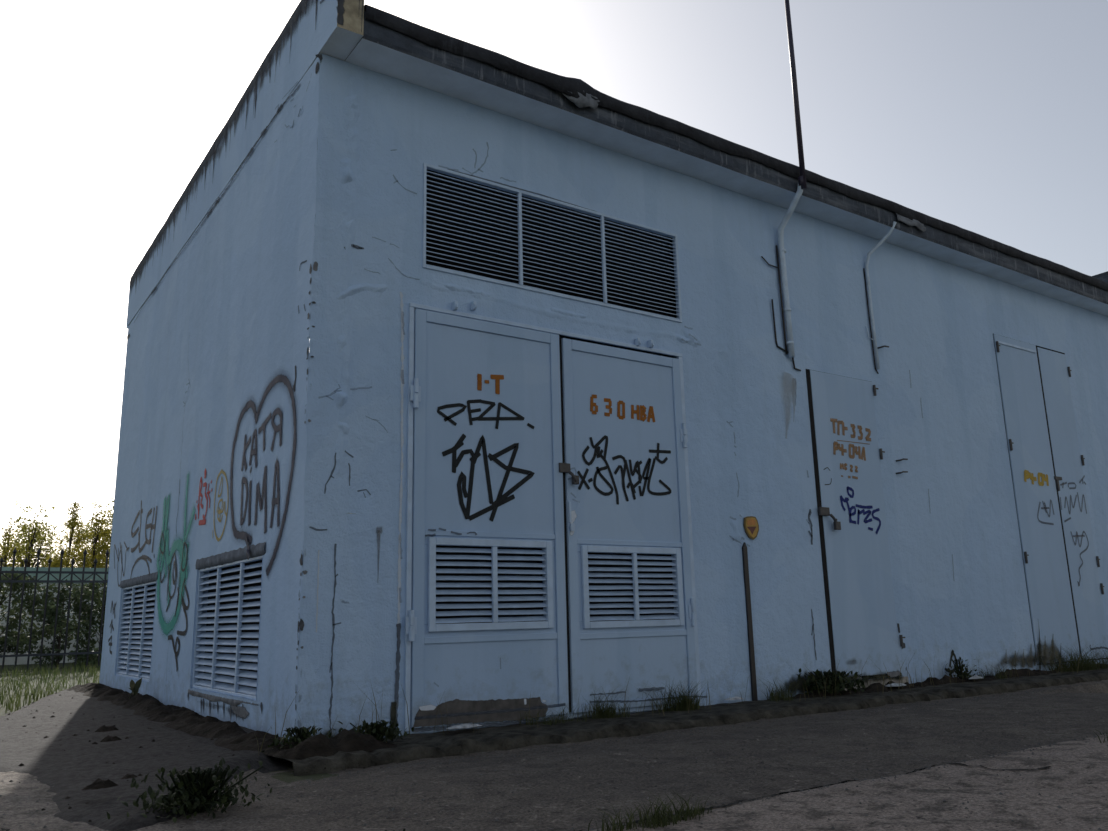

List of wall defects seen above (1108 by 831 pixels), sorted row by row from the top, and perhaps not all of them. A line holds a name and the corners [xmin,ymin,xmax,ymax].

water stain [337,0,345,25]
water stain [129,0,317,289]
crack [324,451,371,498]
peeling [413,687,707,732]